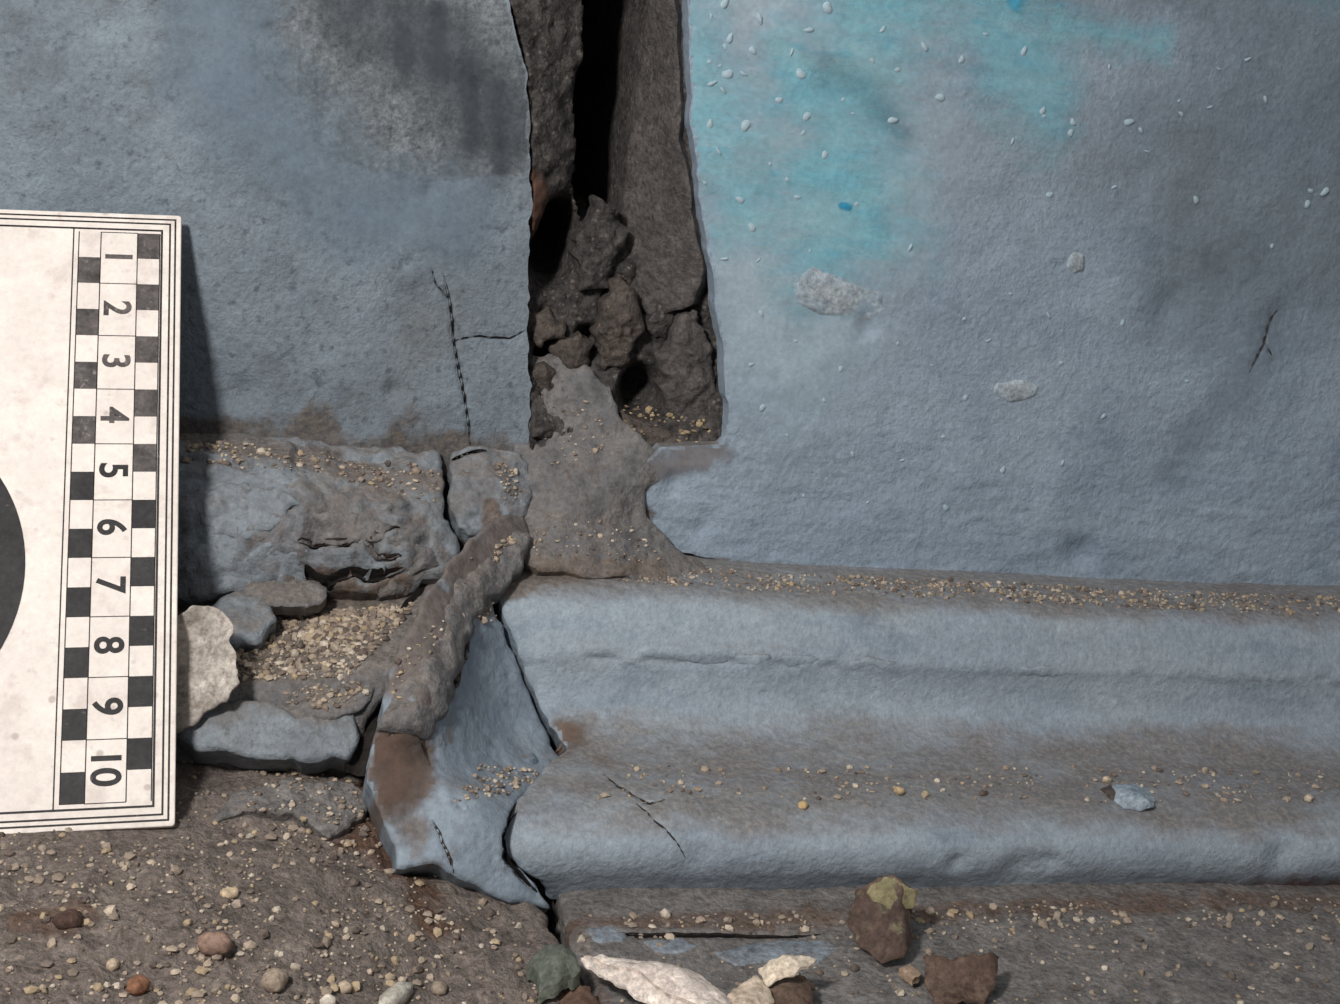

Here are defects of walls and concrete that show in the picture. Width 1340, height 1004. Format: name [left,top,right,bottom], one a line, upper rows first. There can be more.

crack [432,271,523,552]
spalling [256,0,723,450]
leakage [689,0,923,391]
crack [1249,311,1277,373]
crack [344,706,381,776]
flaking render [176,432,559,913]
crack [502,802,549,914]
crack [603,774,685,857]